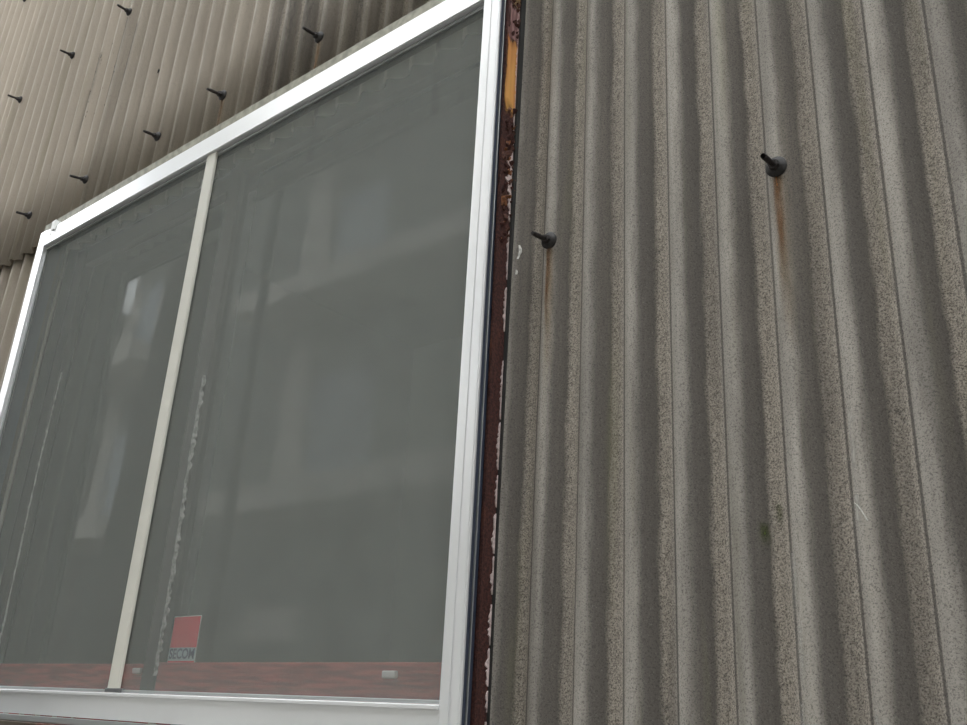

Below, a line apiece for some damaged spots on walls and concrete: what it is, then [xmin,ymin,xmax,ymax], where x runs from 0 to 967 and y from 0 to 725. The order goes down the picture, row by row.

peeling [503,144,514,331]
corrosion [499,0,522,242]
corrosion [774,176,784,261]
peeling [485,362,504,725]